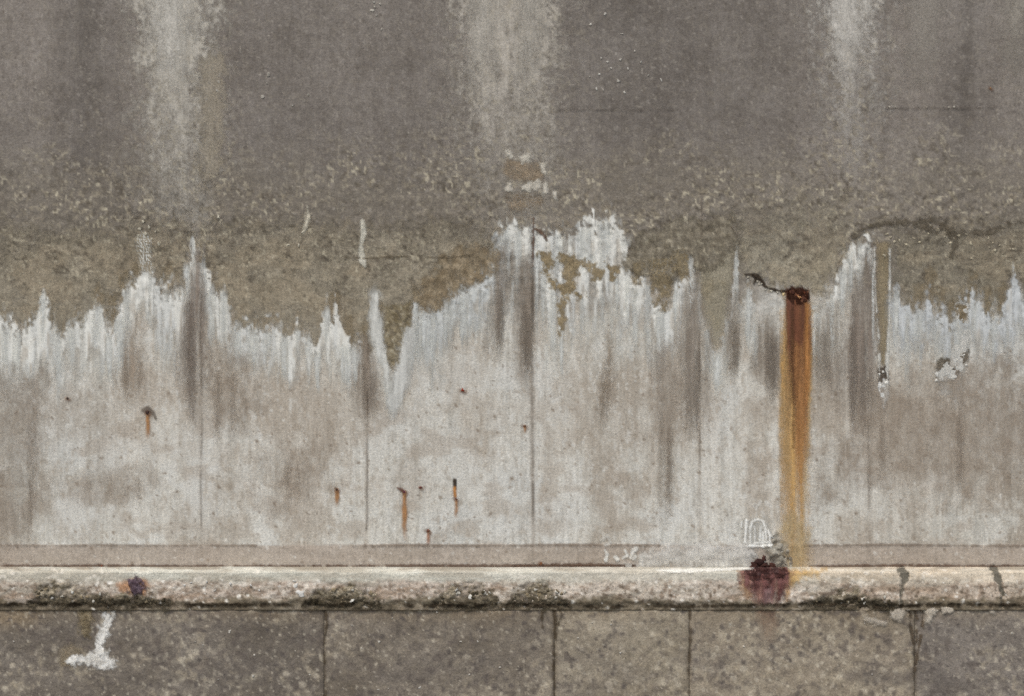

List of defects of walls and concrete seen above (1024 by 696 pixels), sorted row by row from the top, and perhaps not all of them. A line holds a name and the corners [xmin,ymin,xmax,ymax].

damp [437,0,568,193]
rust [142,406,156,433]
damp [0,237,376,443]
rust [397,487,407,531]
damp [410,189,780,465]
rust [739,286,819,603]
damp [809,232,1024,482]
spalling [935,350,970,382]